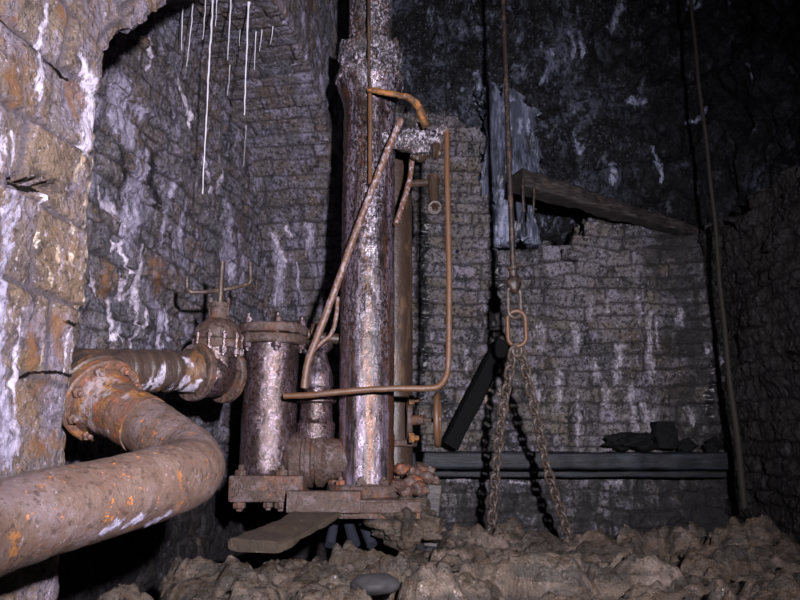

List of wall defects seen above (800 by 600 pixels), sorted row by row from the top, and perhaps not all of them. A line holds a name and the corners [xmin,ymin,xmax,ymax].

leakage [29,3,49,102]
leakage [177,74,194,128]
leakage [0,130,15,172]
leakage [202,154,224,195]
leakage [48,53,191,373]
leakage [218,201,249,298]
leakage [268,222,301,310]
leakage [303,222,315,258]
leakage [635,296,659,380]
crack [19,370,72,379]
leakage [592,343,625,407]
leakage [628,385,657,432]